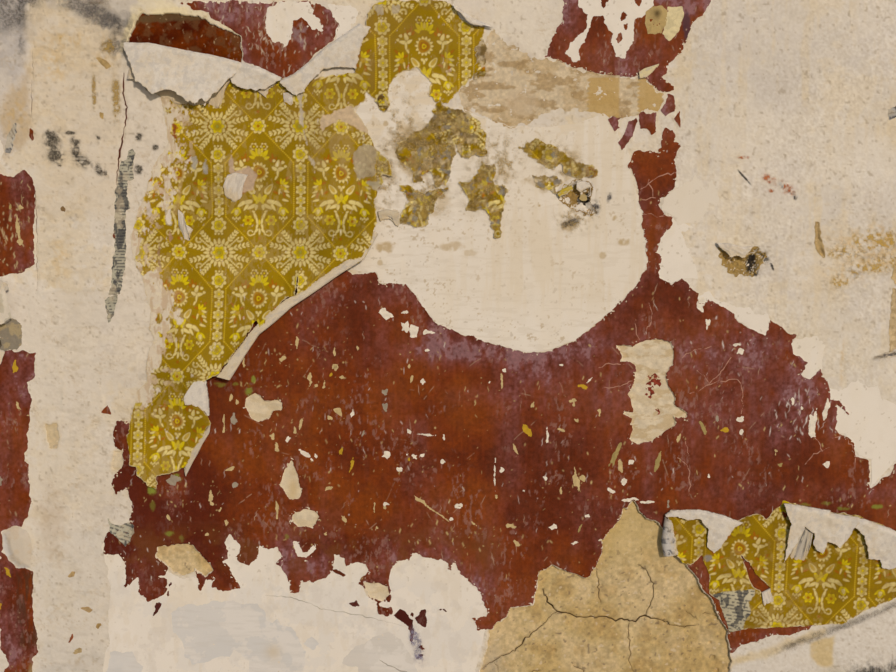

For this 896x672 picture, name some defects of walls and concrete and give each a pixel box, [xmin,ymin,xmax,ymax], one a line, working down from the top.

peeling [129,0,358,78]
peeling [545,0,711,150]
peeling [103,128,896,672]
crack [488,565,718,667]